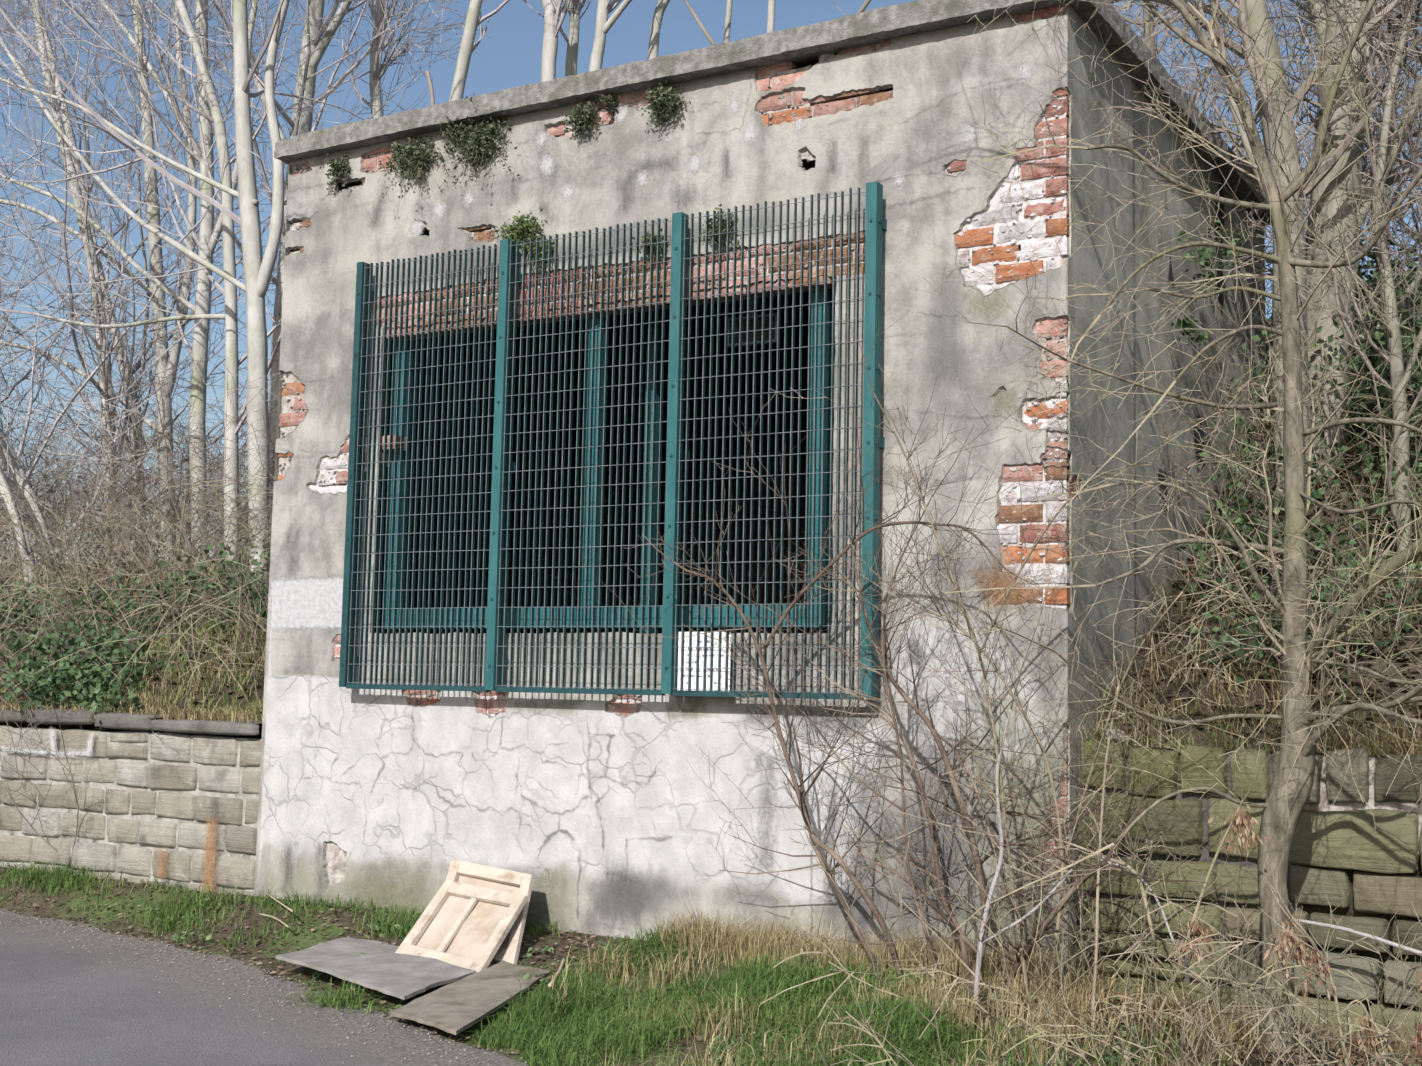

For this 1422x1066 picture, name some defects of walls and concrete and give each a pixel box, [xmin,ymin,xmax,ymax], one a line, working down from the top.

spalling [754,40,893,128]
spalling [797,147,816,172]
spalling [953,87,1070,296]
spalling [277,370,309,481]
spalling [306,434,407,494]
spalling [990,315,1081,611]
spalling [402,690,441,707]
spalling [472,690,509,718]
spalling [605,694,642,718]
corrosion [203,819,217,895]
spalling [322,841,347,889]